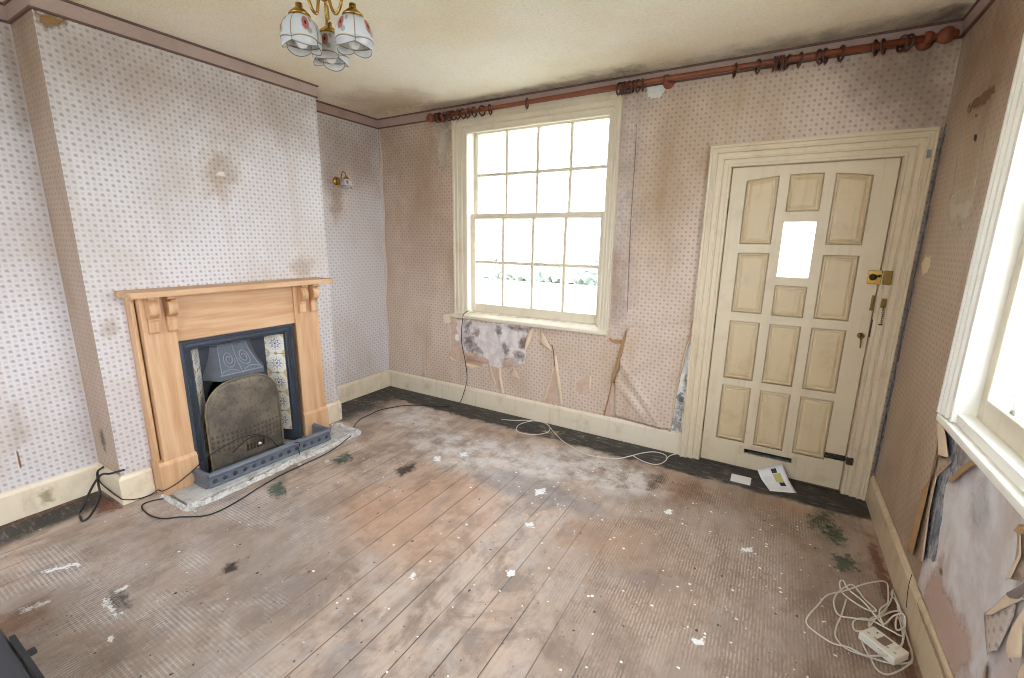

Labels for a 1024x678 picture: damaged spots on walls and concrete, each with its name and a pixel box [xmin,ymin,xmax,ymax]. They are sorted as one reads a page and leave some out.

peeling [448,320,552,379]
peeling [907,422,1024,678]